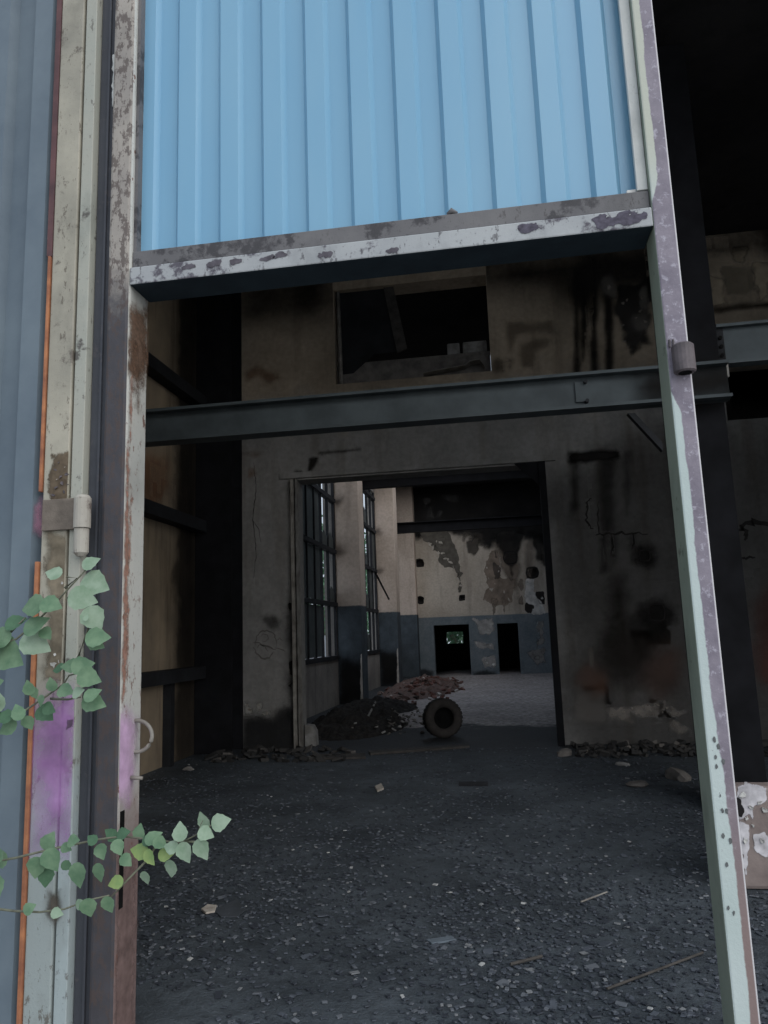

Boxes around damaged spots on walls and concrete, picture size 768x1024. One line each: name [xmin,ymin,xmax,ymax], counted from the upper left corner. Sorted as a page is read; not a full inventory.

peeling [182,258,242,270]
peeling [259,251,287,261]
peeling [518,222,542,234]
peeling [591,210,648,229]
leakage [580,295,613,371]
rust [122,308,149,700]
peeling [420,531,465,601]
leakage [467,535,480,555]
leakage [495,529,545,588]
crack [585,498,648,557]
spalling [472,551,546,667]
peeling [720,782,768,875]